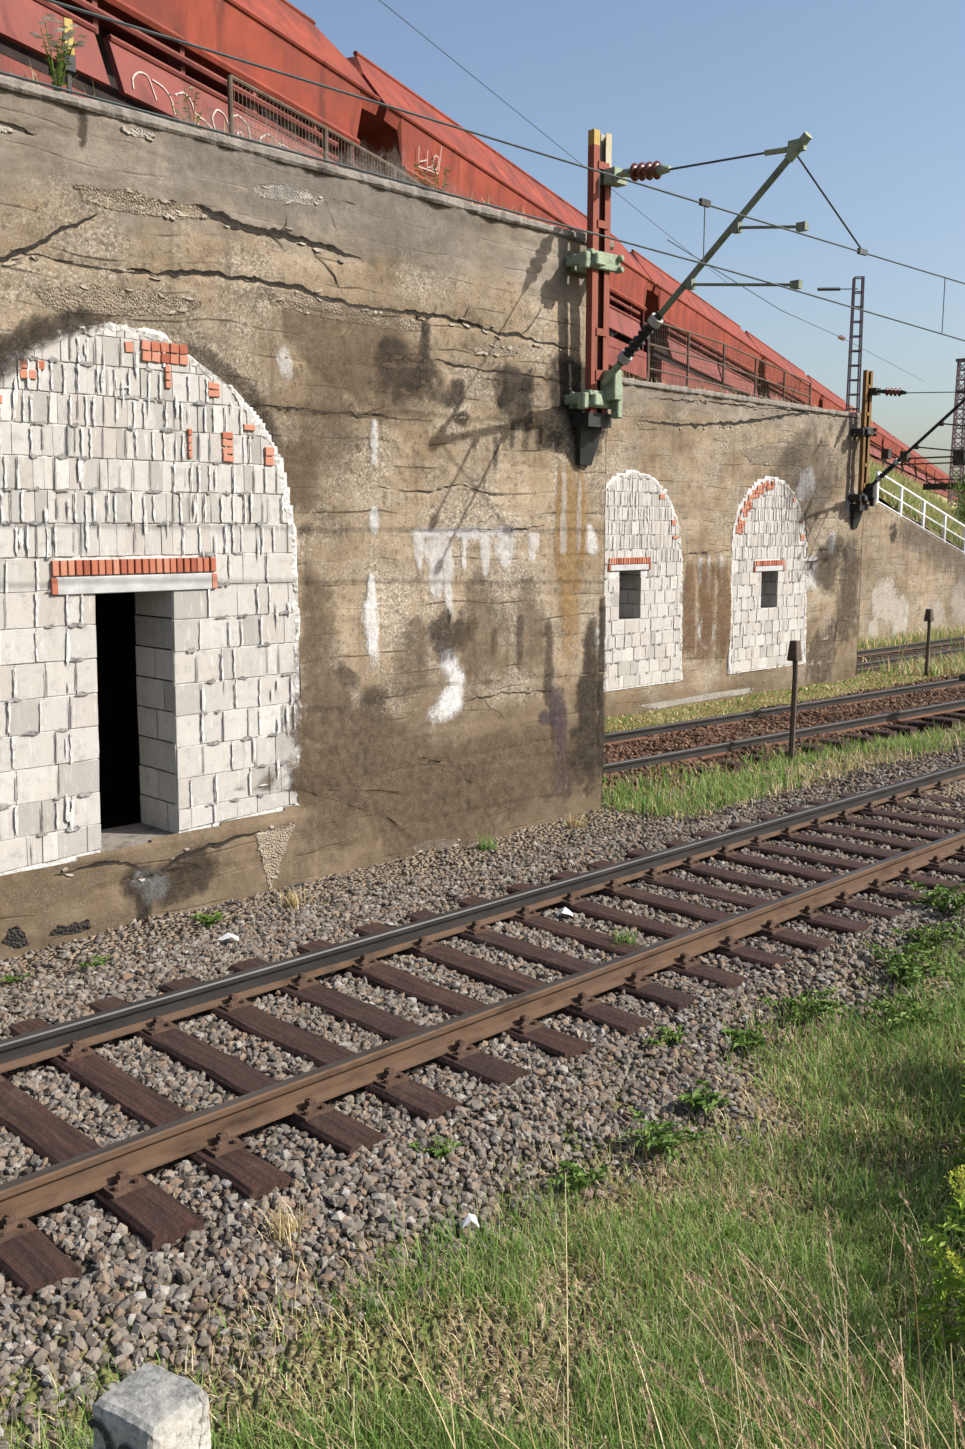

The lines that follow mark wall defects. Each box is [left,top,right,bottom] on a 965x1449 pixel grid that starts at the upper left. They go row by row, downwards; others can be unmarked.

spalling [74,184,208,221]
spalling [251,184,325,206]
crack [0,183,579,386]
damp [286,311,470,507]
damp [494,355,585,463]
damp [370,507,378,533]
damp [807,533,858,684]
damp [291,525,607,860]
damp [122,850,217,919]